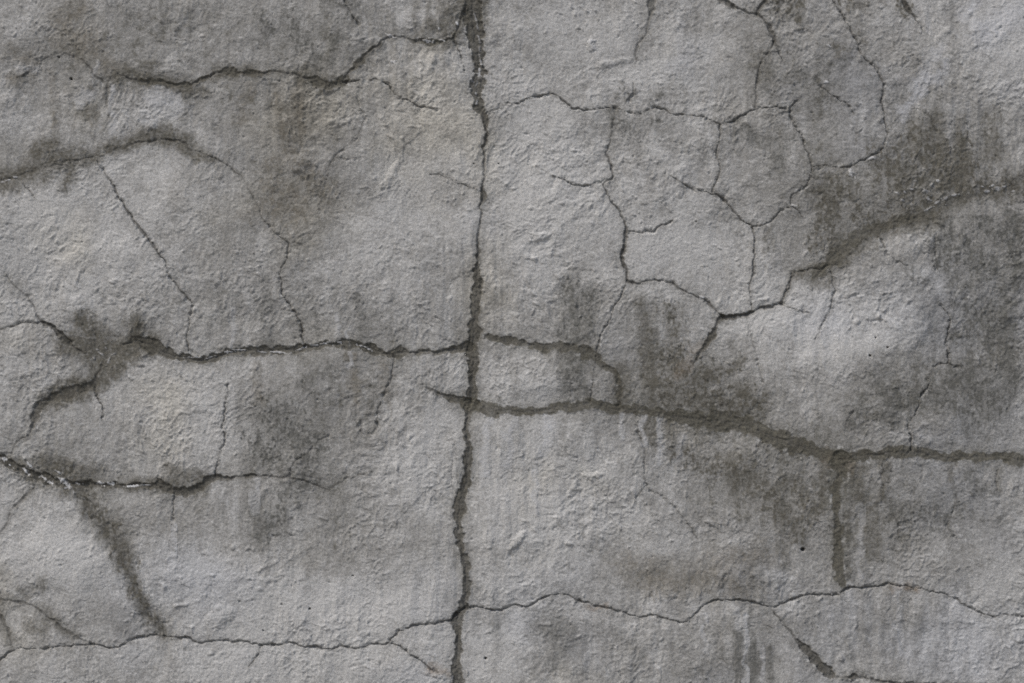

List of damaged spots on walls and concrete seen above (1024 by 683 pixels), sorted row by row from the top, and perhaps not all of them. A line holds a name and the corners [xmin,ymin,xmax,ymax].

leakage [952,0,1024,53]
leakage [20,301,165,424]
leakage [0,445,215,652]
crack [0,0,1024,437]
crack [0,304,1024,683]
leakage [611,292,830,683]
leakage [789,41,1024,439]
leakage [844,459,1004,665]